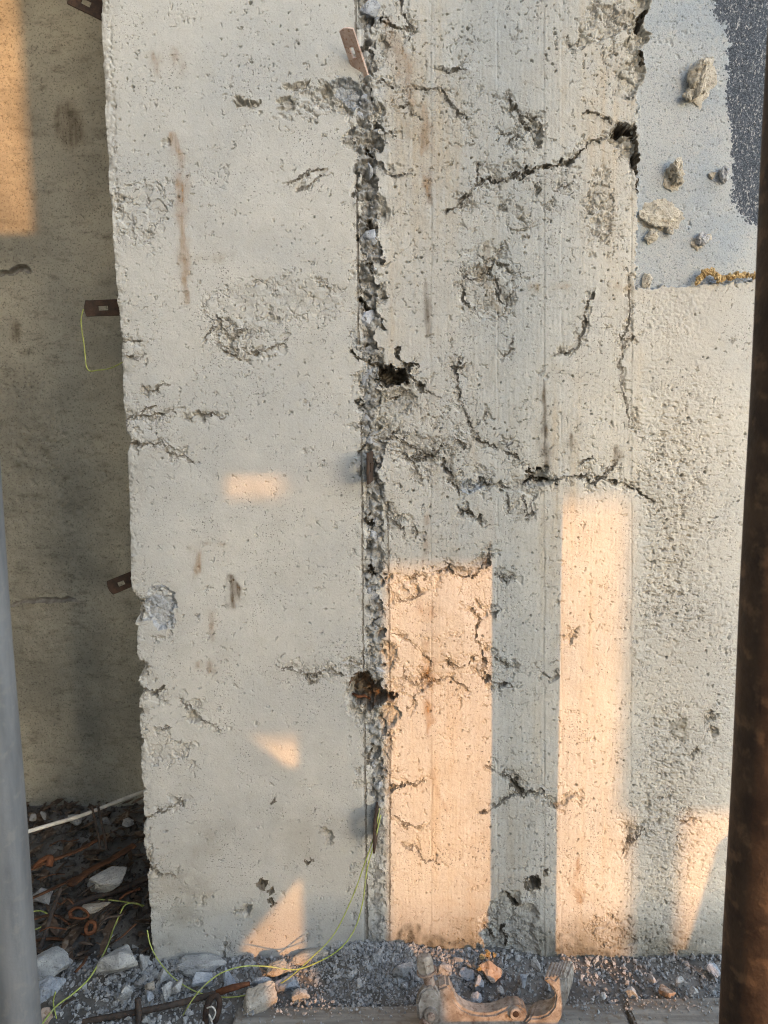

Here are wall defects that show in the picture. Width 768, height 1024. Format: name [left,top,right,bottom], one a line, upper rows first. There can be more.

crack [375,65,468,138]
crack [445,109,612,215]
flaking render [568,0,768,290]
spalling [376,195,392,226]
spalling [373,383,415,440]
crack [390,359,524,584]
crack [504,455,656,520]
spalling [135,584,178,631]
spalling [384,573,427,603]
spalling [379,635,400,671]
crack [479,761,558,815]
crack [387,777,443,865]